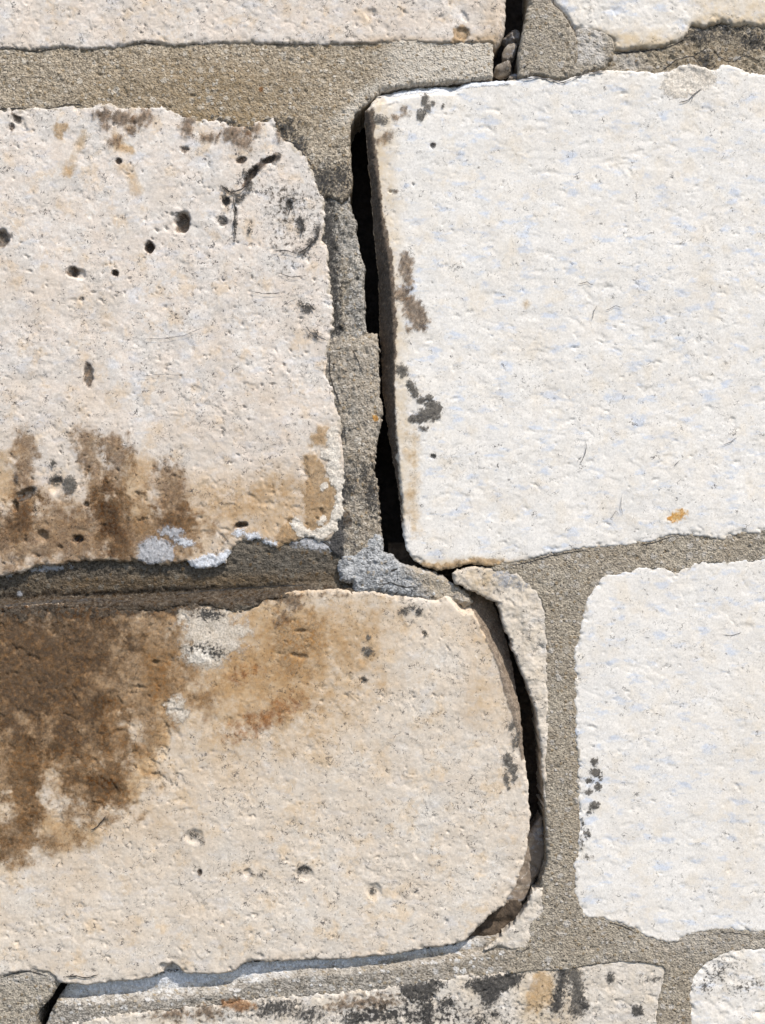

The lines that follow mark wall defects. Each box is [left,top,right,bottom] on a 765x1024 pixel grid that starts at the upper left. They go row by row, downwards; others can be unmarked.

crack [492,0,759,83]
crack [222,184,248,236]
crack [256,118,583,588]
damp [138,525,195,565]
damp [188,549,231,569]
damp [231,527,332,552]
damp [266,594,329,687]
damp [397,605,423,616]
damp [0,603,145,763]
crack [492,601,539,822]
crack [410,876,538,952]
crack [1,971,97,1024]